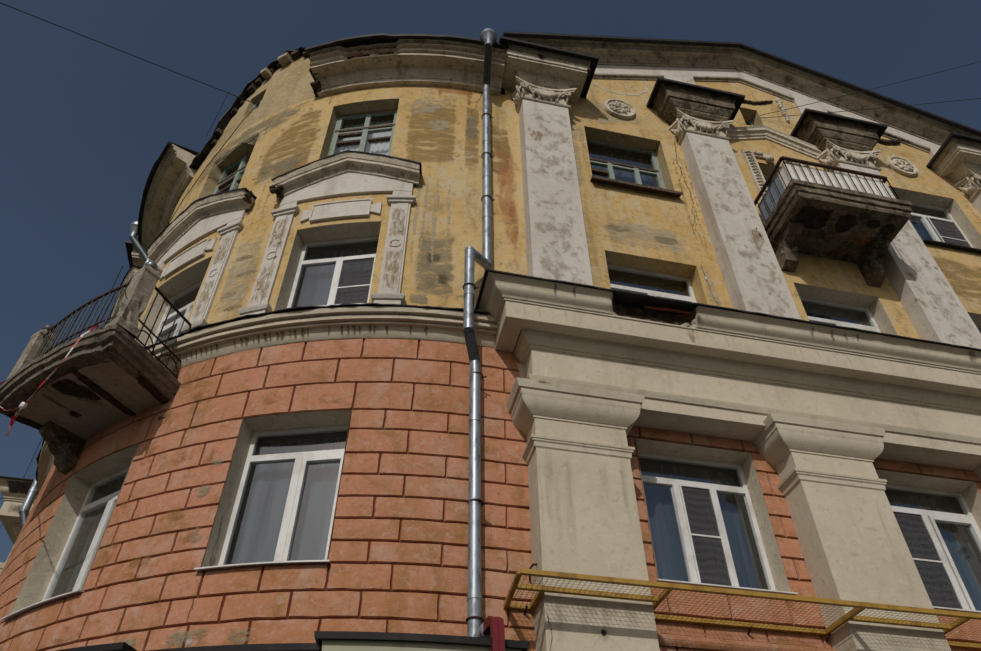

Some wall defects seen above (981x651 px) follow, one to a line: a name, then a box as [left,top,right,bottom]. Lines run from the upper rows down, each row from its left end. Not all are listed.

peeling [199,54,322,204]
peeling [405,99,510,172]
spalling [794,206,857,235]
spalling [612,297,696,326]
spalling [43,367,136,418]